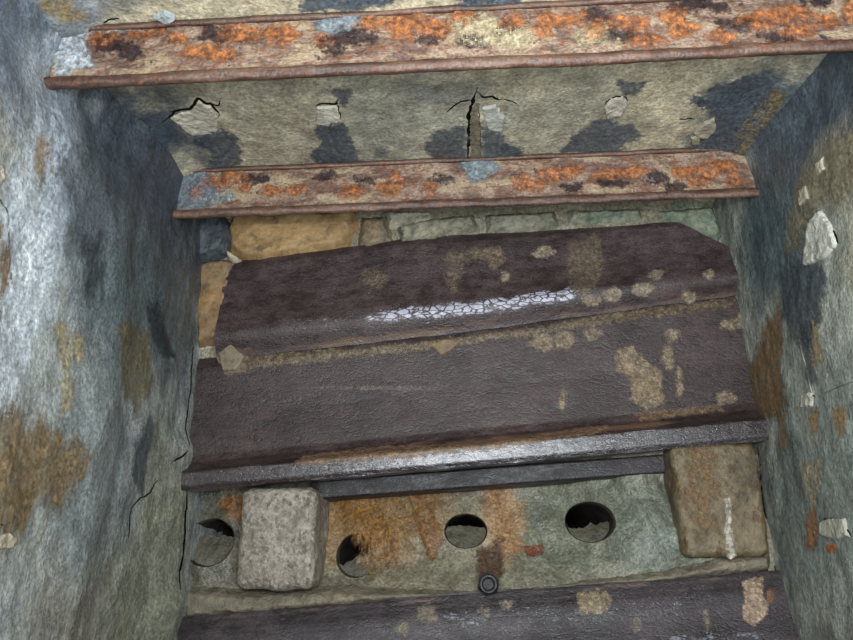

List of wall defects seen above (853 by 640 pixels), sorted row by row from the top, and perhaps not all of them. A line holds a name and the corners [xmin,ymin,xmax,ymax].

rust [81,22,303,62]
rust [360,11,477,41]
rust [497,0,853,48]
crack [163,97,221,137]
crack [446,88,517,158]
leakage [501,145,521,157]
rust [671,89,786,188]
rust [511,163,648,193]
peeling [784,133,853,266]
rust [336,498,399,576]
rust [477,490,543,578]
spalling [818,518,852,552]